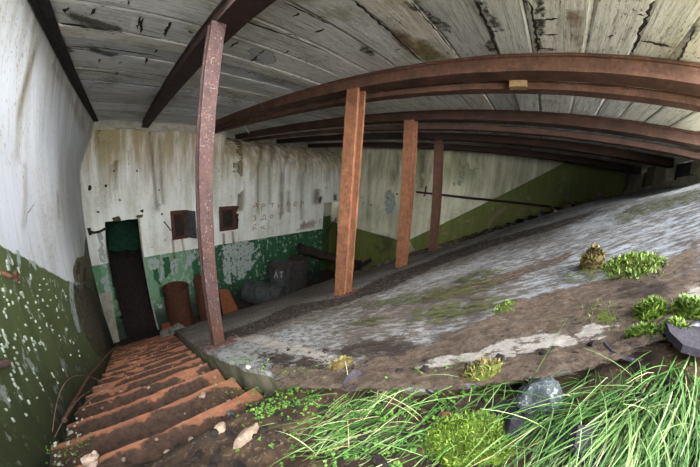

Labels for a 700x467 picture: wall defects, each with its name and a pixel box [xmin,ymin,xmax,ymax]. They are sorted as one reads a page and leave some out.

leakage [397,33,445,60]
crack [475,2,499,53]
crack [528,1,554,52]
crack [631,1,695,61]
leakage [233,139,242,176]
peeling [221,240,256,284]
spalling [2,233,111,357]
peeling [0,329,47,422]